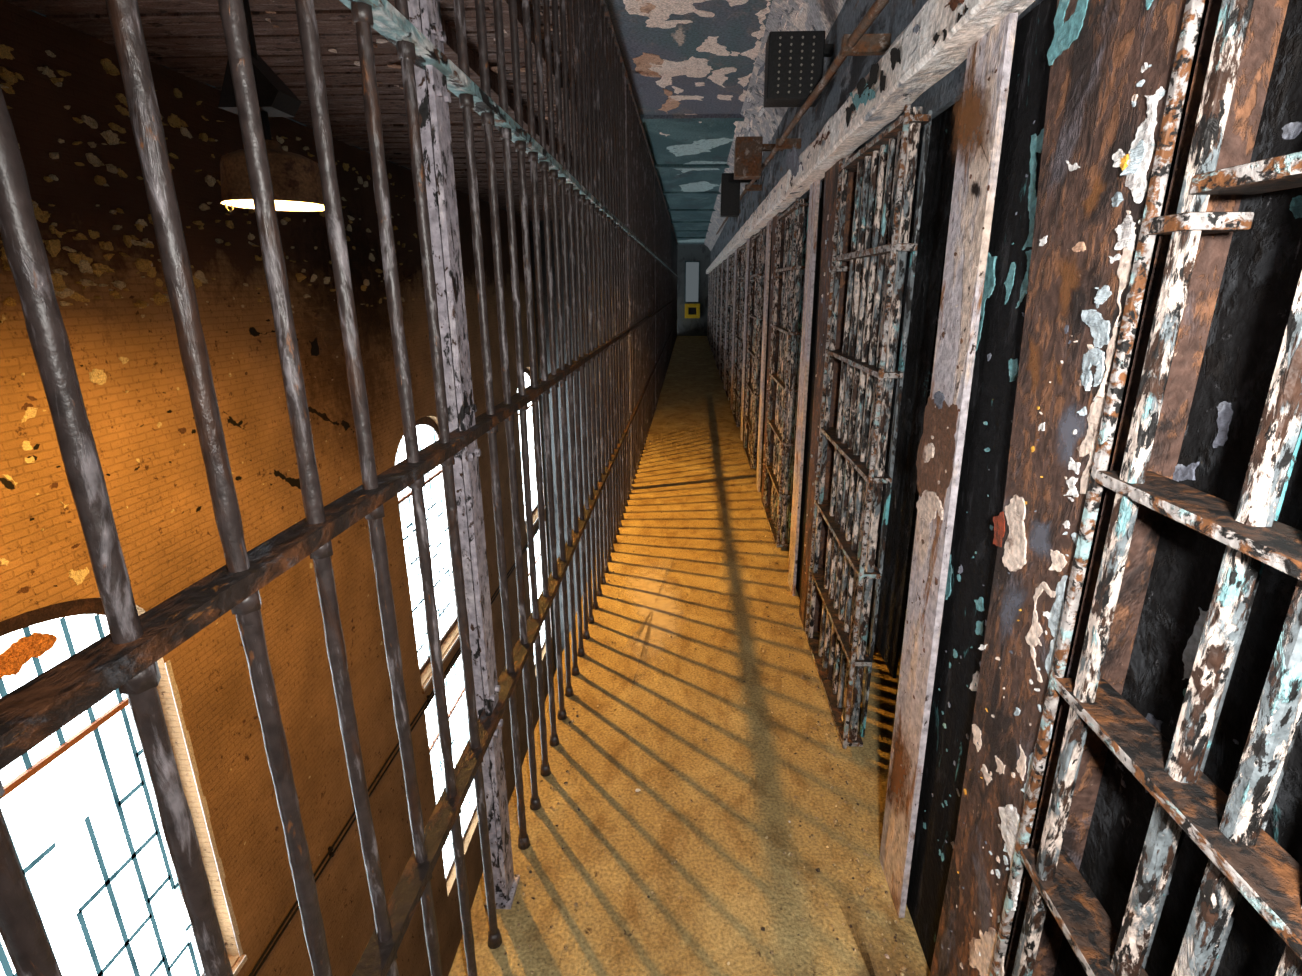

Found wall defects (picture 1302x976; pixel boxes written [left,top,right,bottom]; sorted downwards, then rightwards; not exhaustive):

peeling [0,44,24,109]
peeling [37,50,71,87]
peeling [43,93,143,186]
peeling [160,88,225,172]
peeling [31,199,171,318]
peeling [186,170,263,261]
peeling [335,161,424,306]
peeling [1031,62,1167,502]
spalling [916,389,960,523]
peeling [911,551,977,604]
peeling [945,495,1079,726]
peeling [960,724,1052,976]